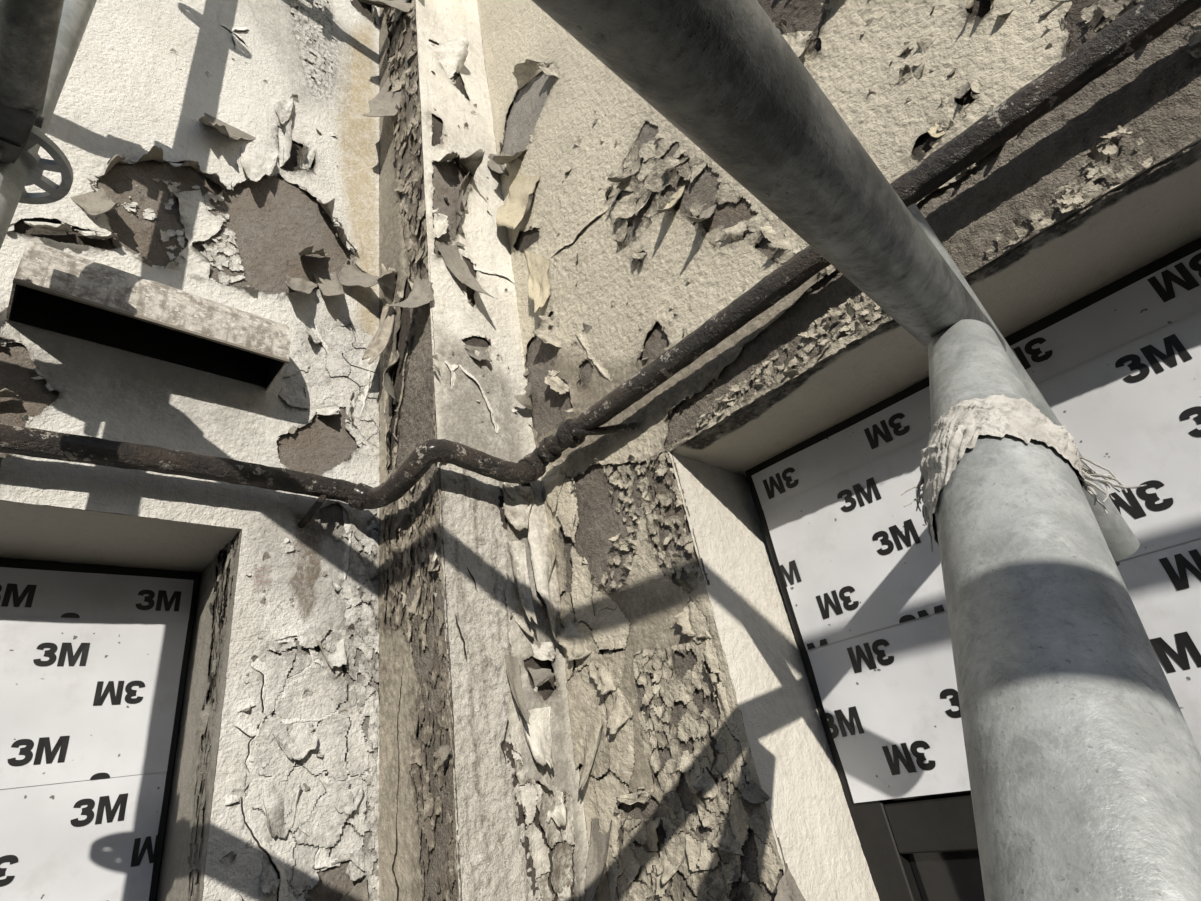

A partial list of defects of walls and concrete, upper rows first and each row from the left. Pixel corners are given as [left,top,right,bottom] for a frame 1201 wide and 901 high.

peeling [0,0,594,475]
peeling [599,120,801,265]
peeling [757,0,832,58]
peeling [889,37,957,85]
peeling [912,0,1201,278]
peeling [188,264,896,901]
crack [225,627,349,901]